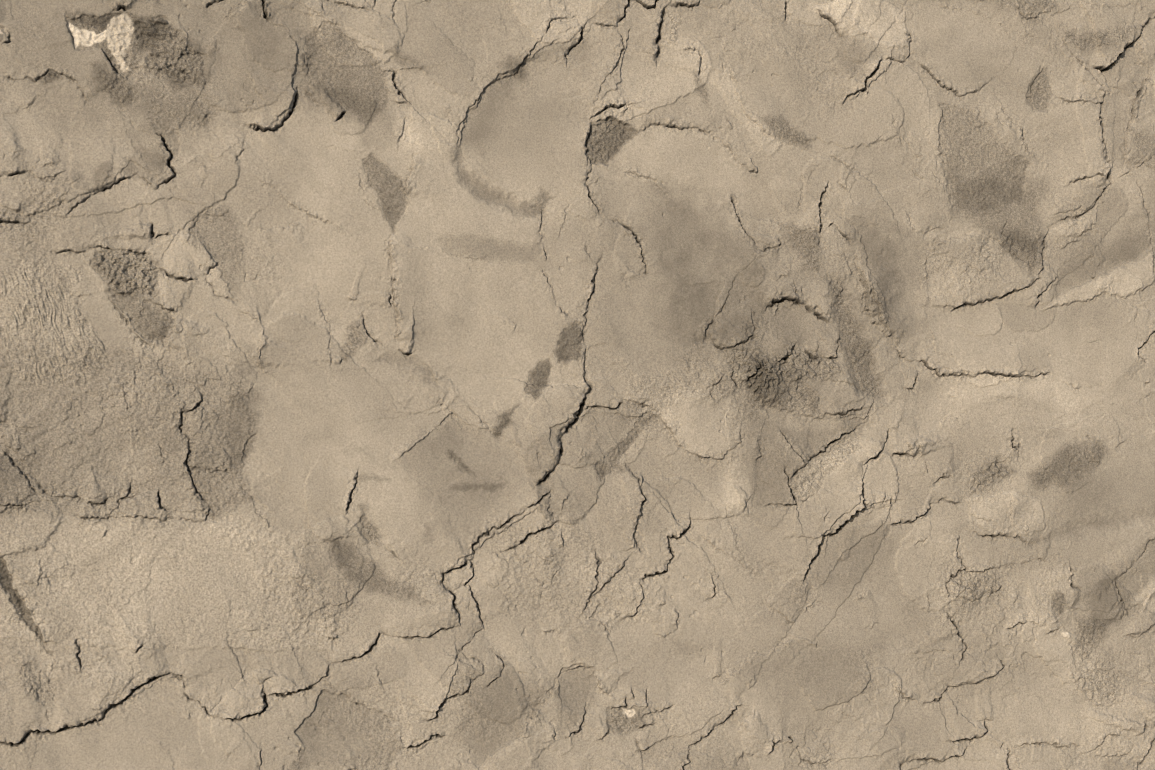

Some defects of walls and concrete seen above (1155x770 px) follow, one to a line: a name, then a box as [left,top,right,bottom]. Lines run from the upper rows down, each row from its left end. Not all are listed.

spalling [0,23,15,47]
peeling [0,59,97,106]
spalling [66,3,210,89]
crack [590,0,701,121]
crack [843,56,907,106]
peeling [899,32,914,61]
crack [1051,69,1153,227]
crack [585,163,649,276]
crack [179,392,233,522]
crack [345,468,360,515]
crack [440,207,659,629]
crack [682,704,745,770]